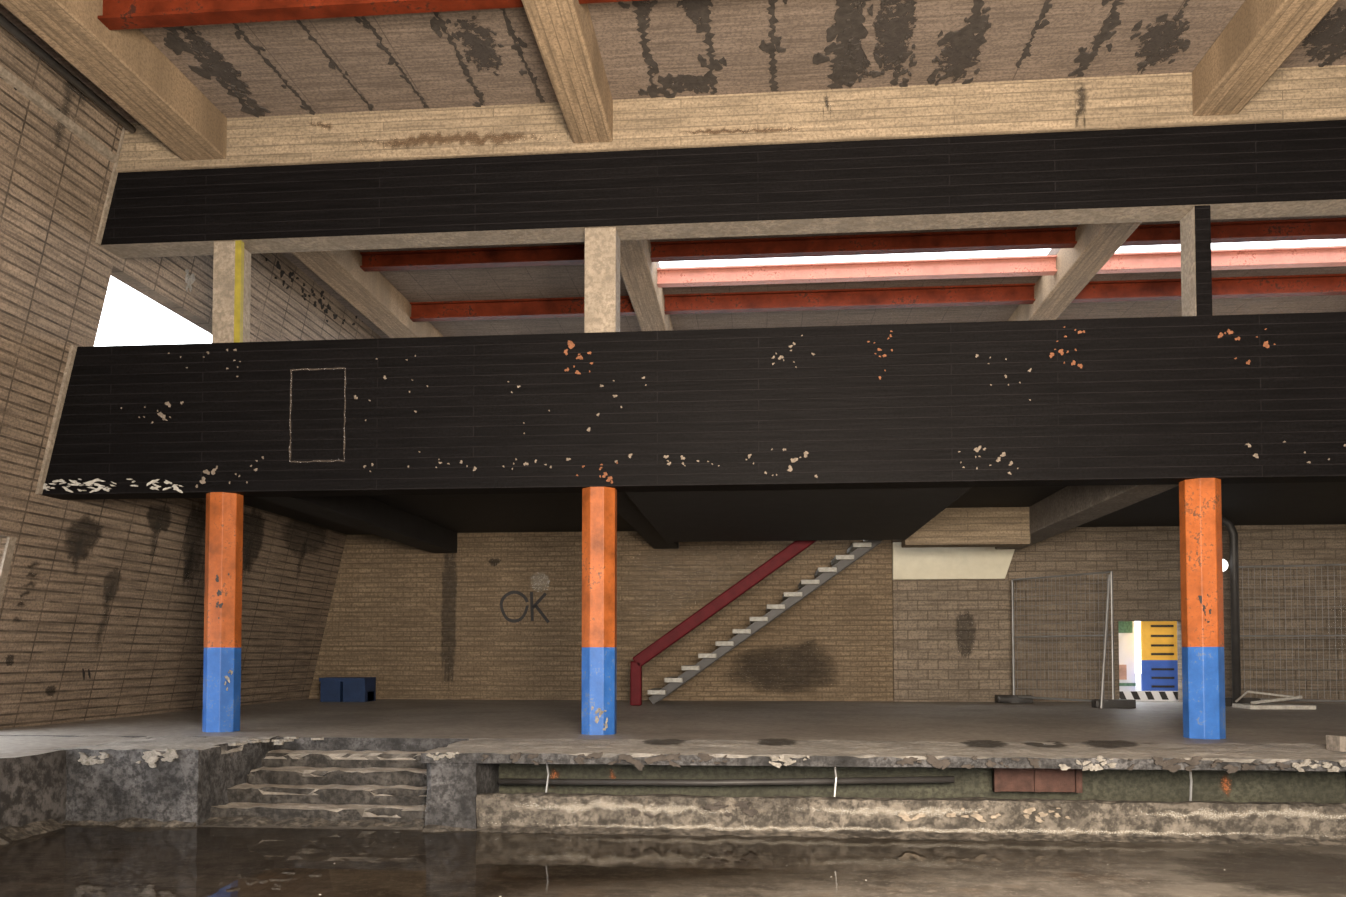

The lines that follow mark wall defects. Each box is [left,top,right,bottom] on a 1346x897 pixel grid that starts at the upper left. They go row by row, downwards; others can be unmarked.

spalling [43,466,218,493]
water stain [67,517,102,567]
water stain [147,507,170,552]
water stain [184,509,205,581]
water stain [442,553,456,680]